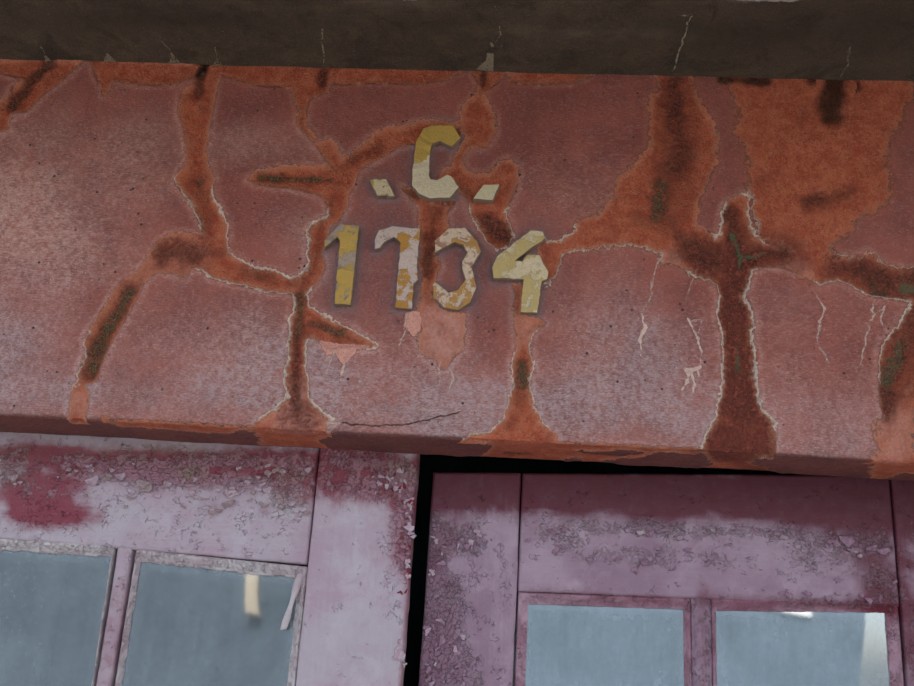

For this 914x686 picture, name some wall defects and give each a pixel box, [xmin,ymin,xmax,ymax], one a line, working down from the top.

crack [67,26,521,432]
crack [467,15,914,461]
peeling [57,463,311,516]
peeling [827,531,893,558]